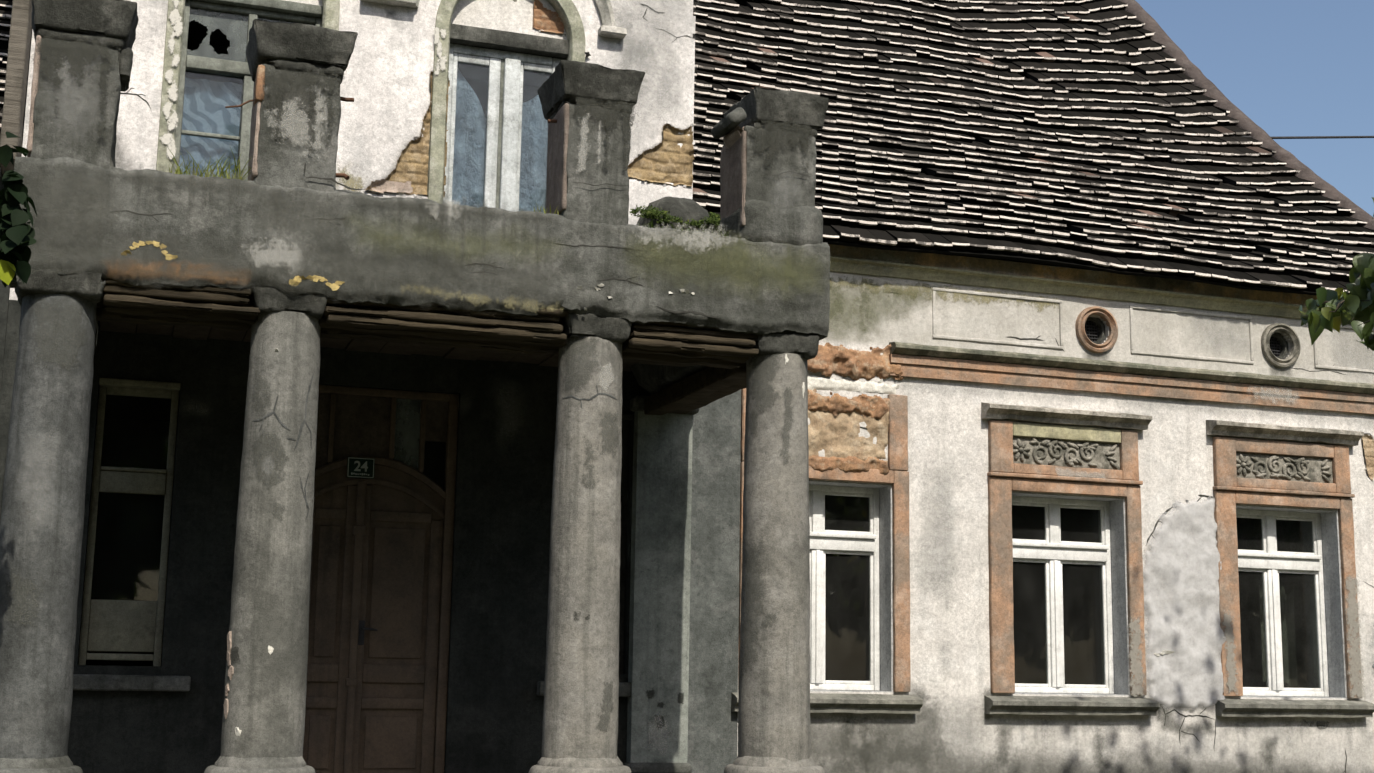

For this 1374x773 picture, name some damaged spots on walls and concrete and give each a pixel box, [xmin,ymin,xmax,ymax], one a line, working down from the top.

spalling [513,0,566,35]
spalling [363,27,450,197]
spalling [627,122,695,188]
spalling [720,131,747,227]
spalling [801,343,904,475]
spalling [1362,434,1374,480]
spalling [223,631,242,736]
peeling [1128,616,1174,697]
crack [1161,706,1216,745]